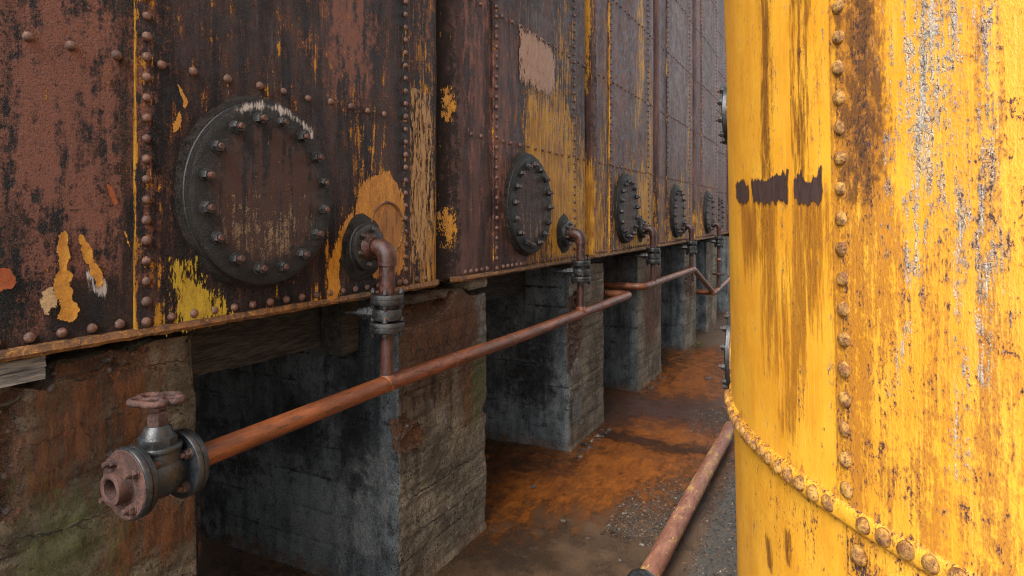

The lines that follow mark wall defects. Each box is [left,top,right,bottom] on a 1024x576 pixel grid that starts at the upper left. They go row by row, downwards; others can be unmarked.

peeling [40,231,107,322]
rust [741,0,893,437]
rust [622,347,725,404]
rust [485,412,721,531]